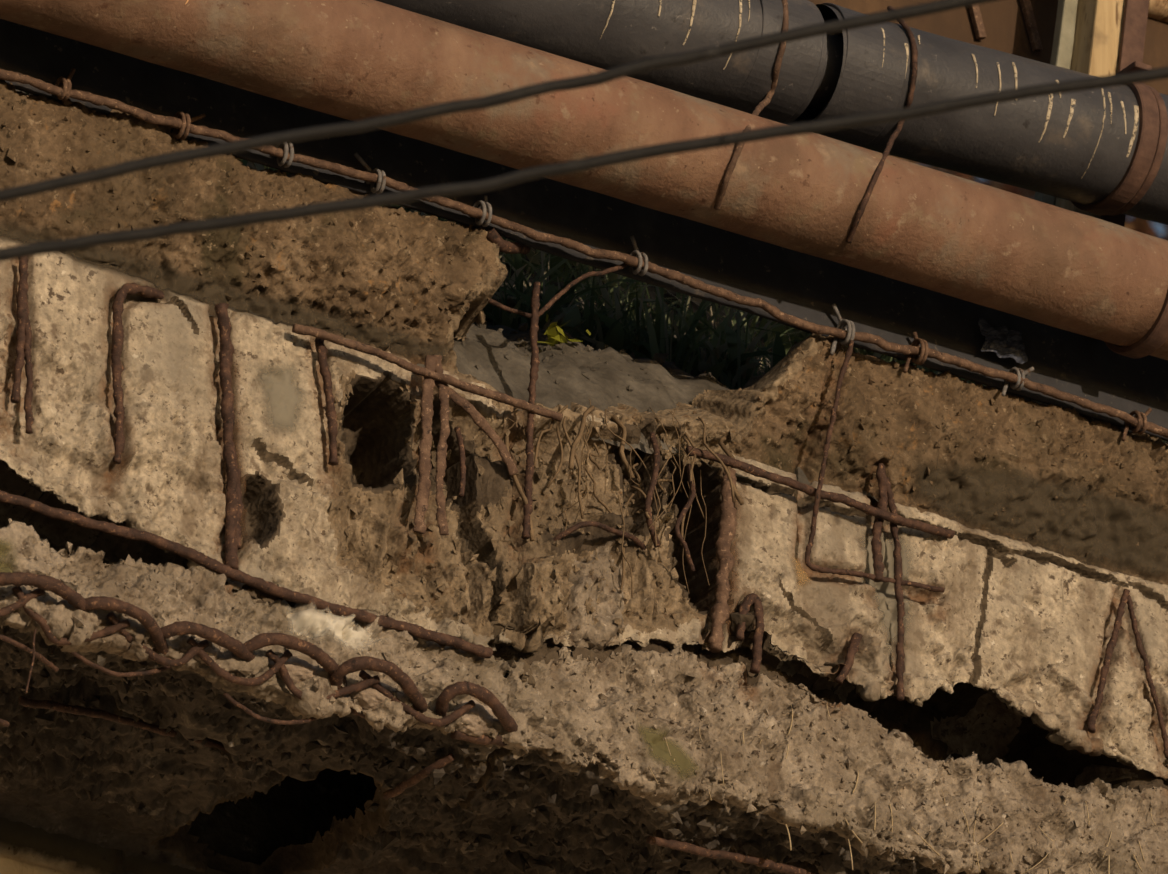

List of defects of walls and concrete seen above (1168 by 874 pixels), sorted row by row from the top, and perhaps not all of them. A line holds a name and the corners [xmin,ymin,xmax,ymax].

spalling [0,68,245,142]
rust [224,363,244,489]
spalling [0,143,1168,792]
crack [736,476,1168,686]